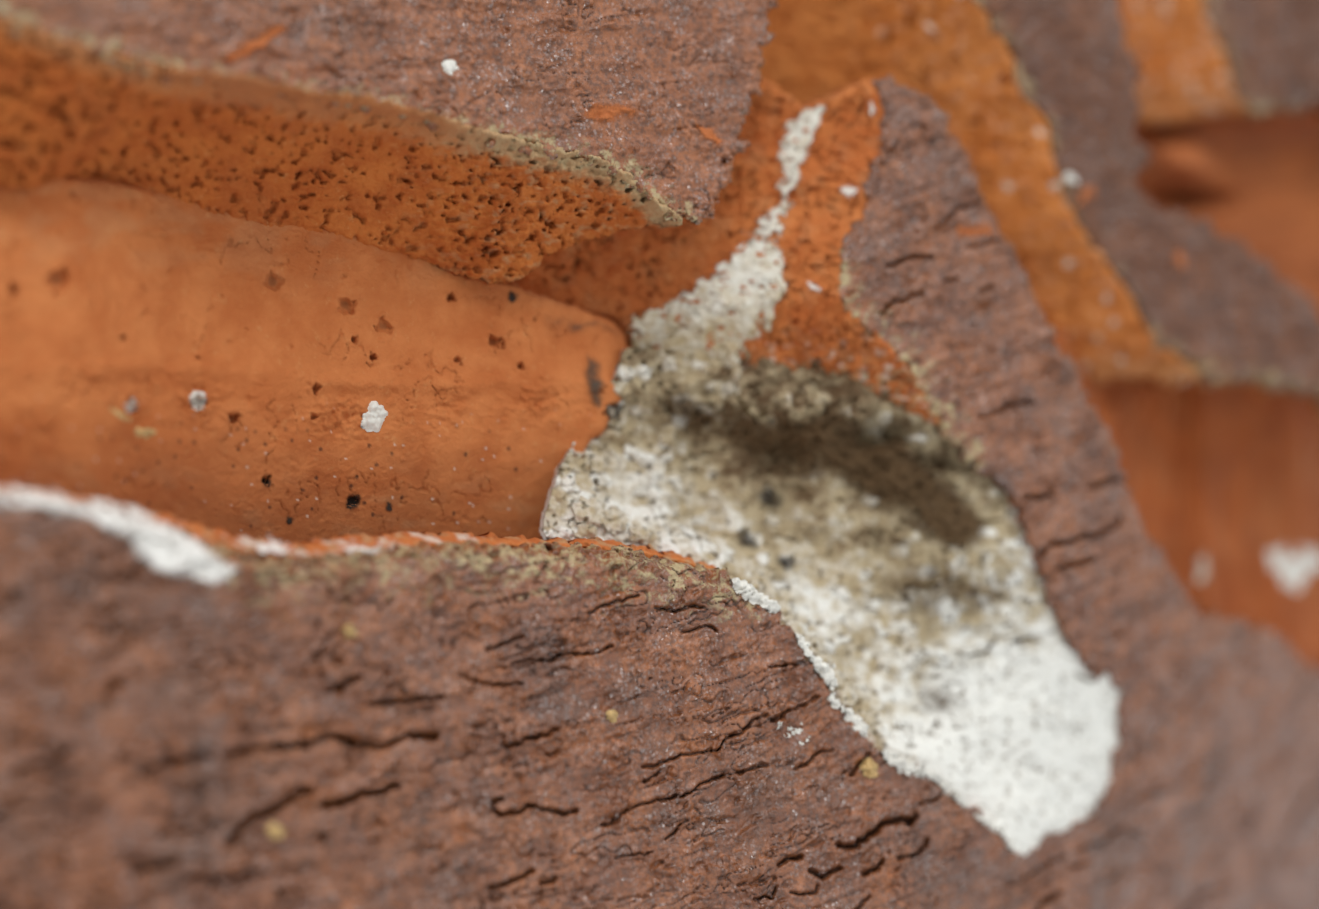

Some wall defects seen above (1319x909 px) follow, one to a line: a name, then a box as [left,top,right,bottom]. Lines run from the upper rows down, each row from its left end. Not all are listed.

spalling [758,0,1319,416]
spalling [0,78,942,544]
spalling [0,486,237,584]
spalling [139,509,271,557]
spalling [256,540,287,554]
spalling [264,531,716,569]
spalling [539,106,1122,856]
spalling [1051,332,1319,670]
crack [488,871,552,889]
crack [491,799,575,815]
crack [611,698,813,856]
crack [756,793,946,908]